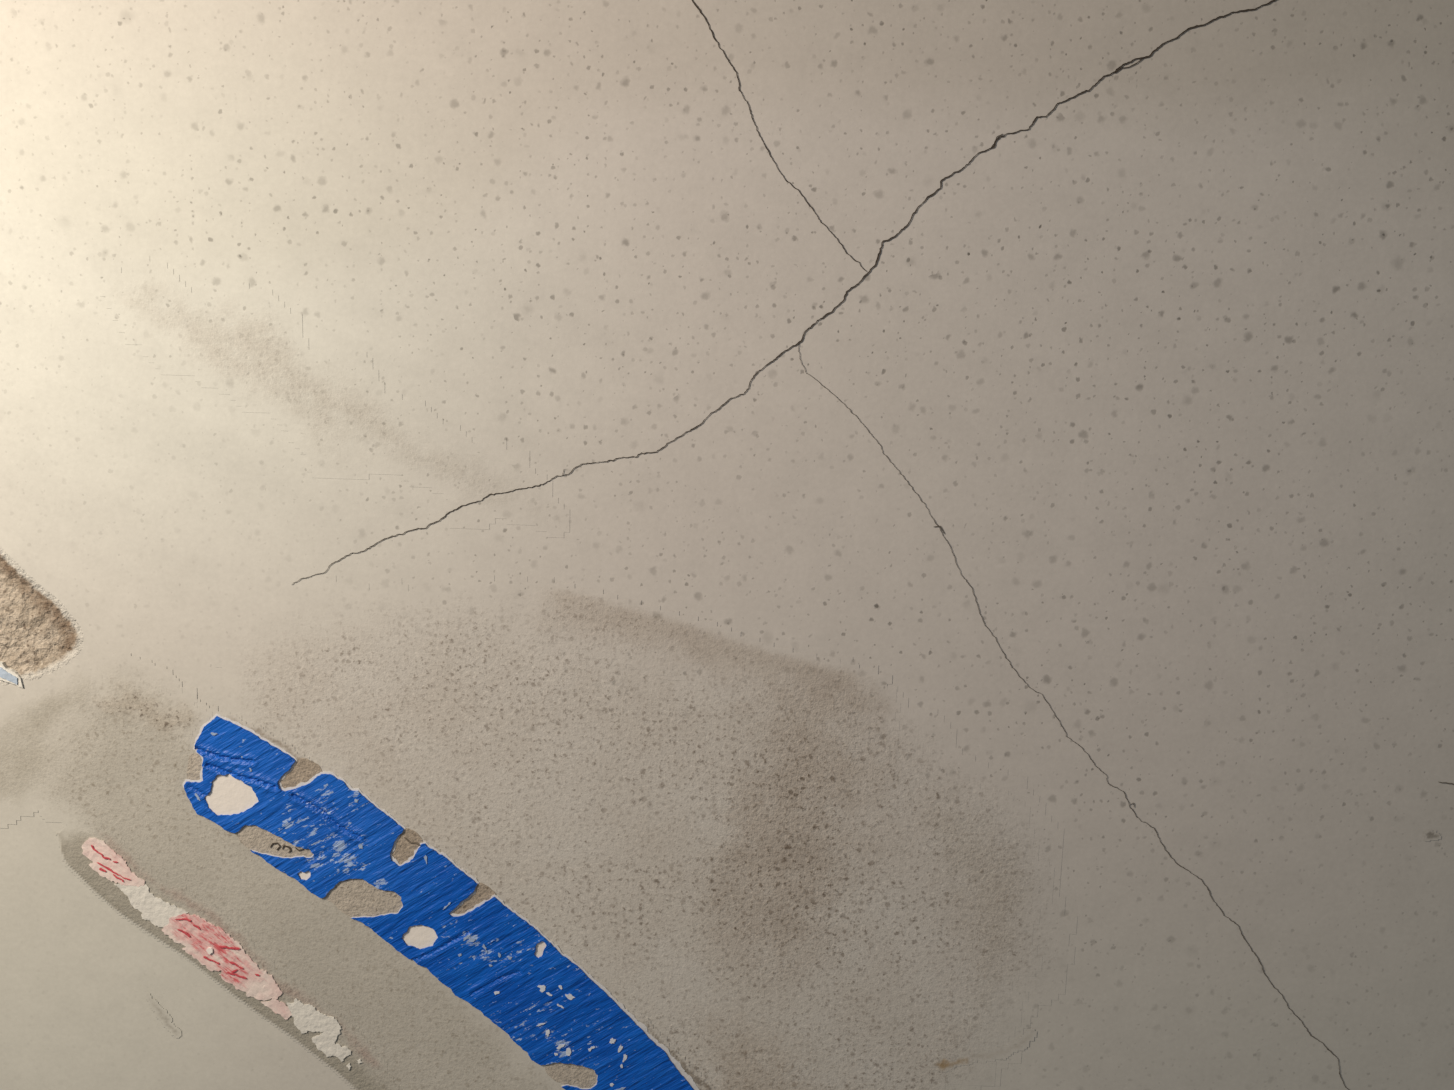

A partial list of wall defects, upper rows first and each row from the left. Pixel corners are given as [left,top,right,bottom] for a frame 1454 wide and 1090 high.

crack [291,0,1349,1090]
peeling [280,758,322,788]
peeling [187,753,313,880]
peeling [392,828,423,865]
peeling [324,879,402,917]
peeling [453,883,496,914]
peeling [82,838,363,1070]
peeling [402,925,438,949]
peeling [534,941,546,958]
peeling [545,1062,597,1088]